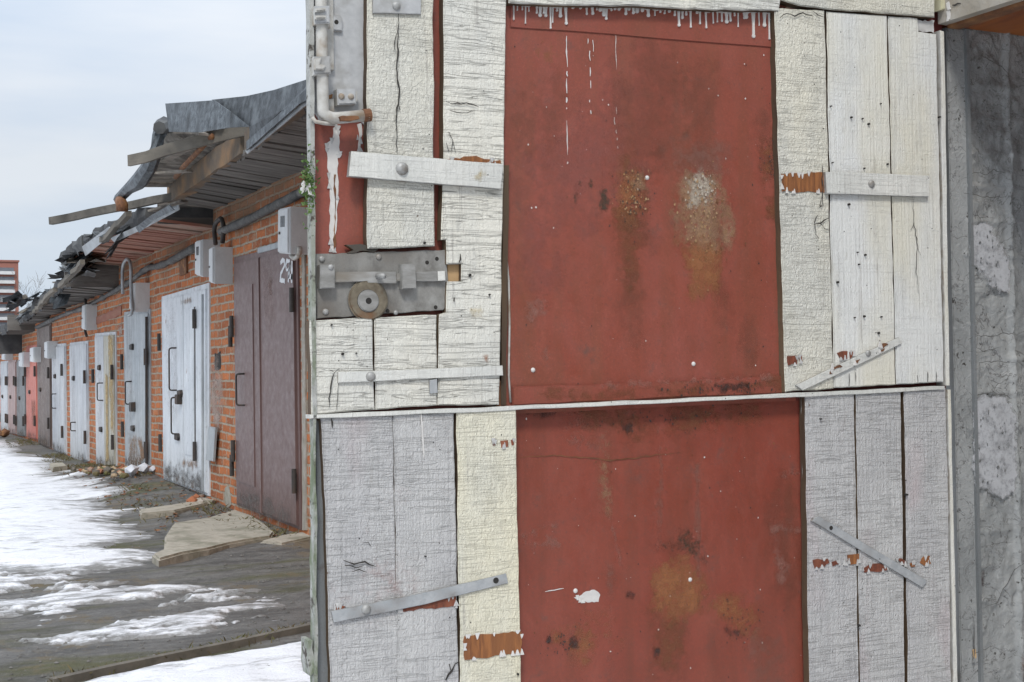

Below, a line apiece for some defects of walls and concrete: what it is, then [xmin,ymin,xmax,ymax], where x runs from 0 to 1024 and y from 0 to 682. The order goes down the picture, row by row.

crack [393,14,401,149]
peeling [324,124,342,253]
peeling [780,171,811,194]
crack [970,327,1021,404]
peeling [812,554,932,574]
crack [973,542,1023,664]
peeling [499,630,524,657]